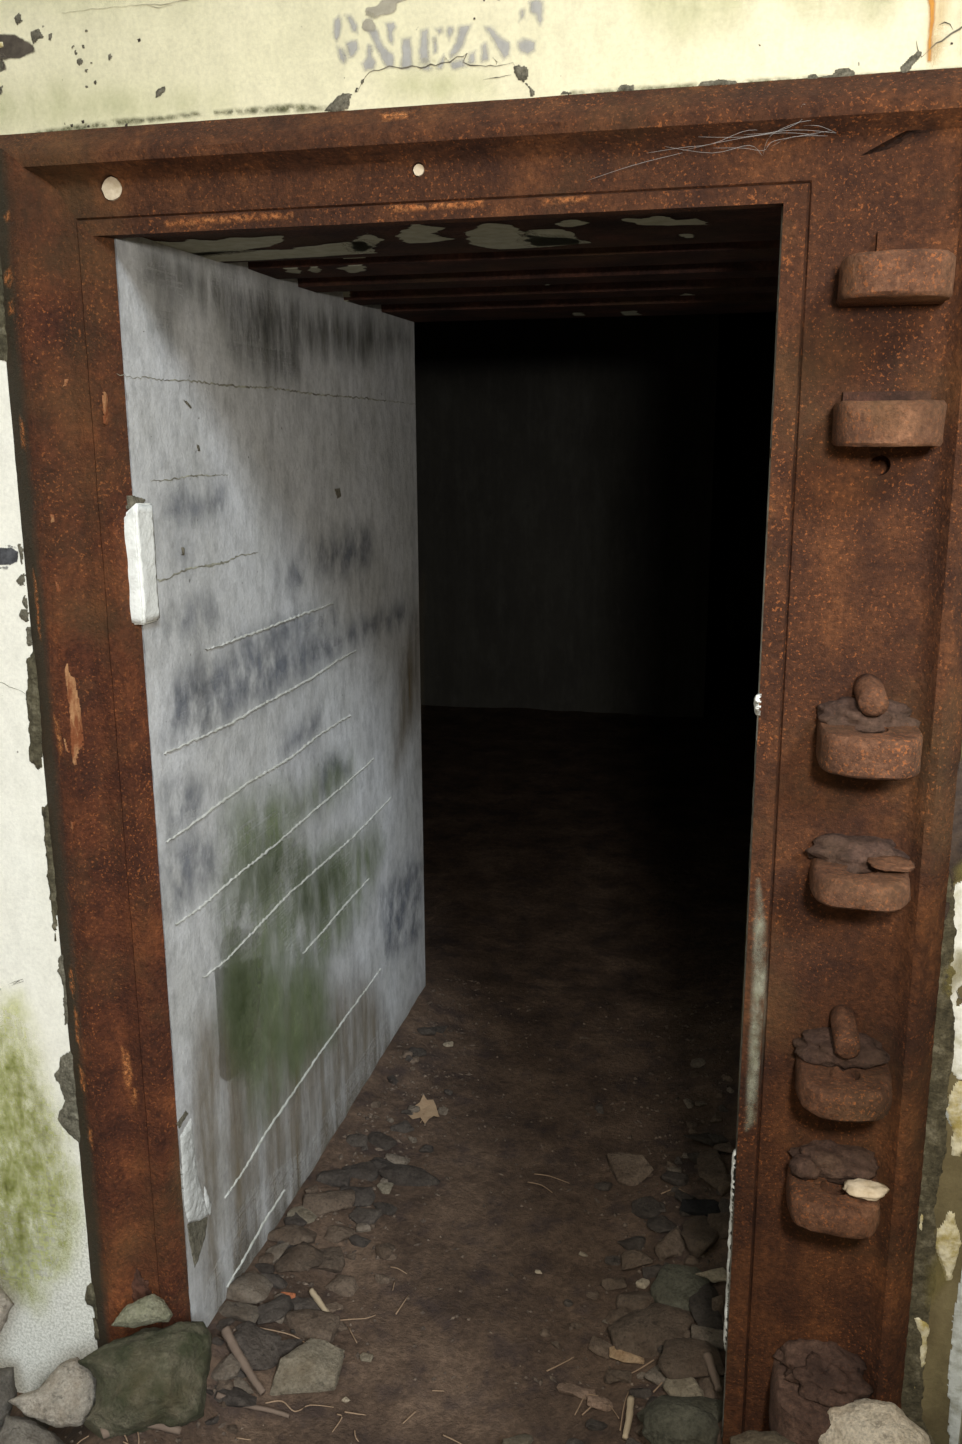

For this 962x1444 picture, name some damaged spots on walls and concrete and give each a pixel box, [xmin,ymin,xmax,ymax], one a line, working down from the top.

crack [62,0,184,13]
spalling [0,13,52,94]
crack [359,53,515,88]
rust [392,200,482,210]
spalling [16,544,43,770]
rust [54,664,84,765]
damp [175,642,314,720]
spalling [54,1051,80,1143]
damp [231,1028,274,1277]
damp [273,1000,376,1221]
rust [787,1140,879,1185]
spalling [901,873,962,1444]